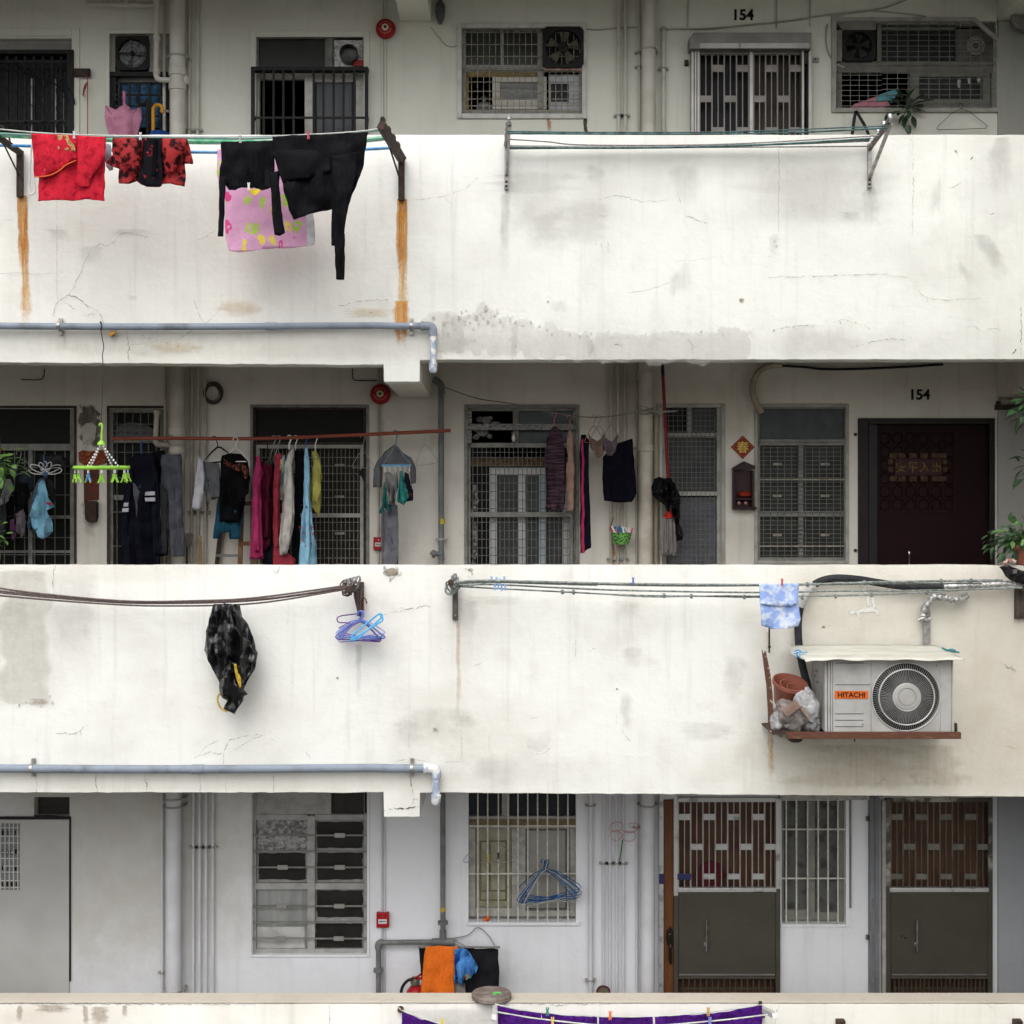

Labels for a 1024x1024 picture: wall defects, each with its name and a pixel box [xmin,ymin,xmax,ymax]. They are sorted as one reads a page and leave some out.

corrosion [17,195,29,310]
crack [53,232,223,359]
corrosion [394,198,407,333]